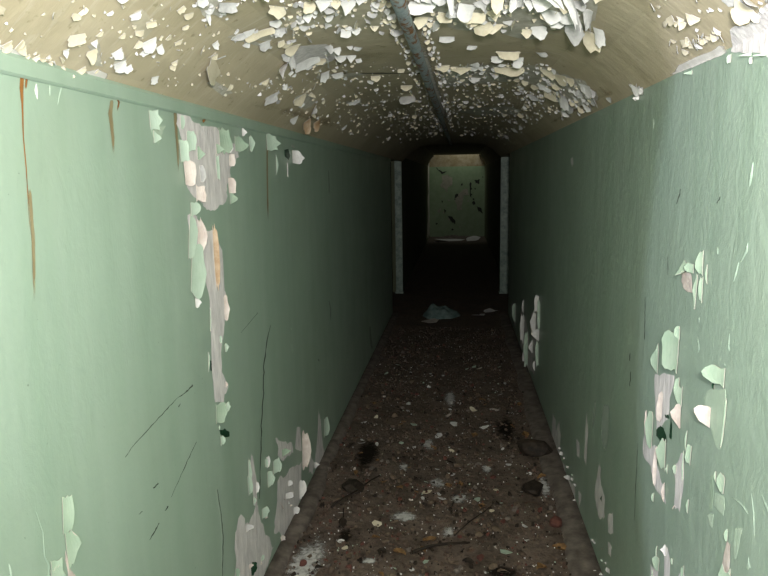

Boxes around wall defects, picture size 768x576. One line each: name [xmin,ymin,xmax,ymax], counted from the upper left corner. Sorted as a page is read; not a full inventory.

peeling [0,0,611,145]
flaking render [651,0,768,75]
corrosion [20,78,35,285]
corrosion [108,100,120,147]
peeling [266,133,304,177]
peeling [176,113,255,446]
peeling [675,250,708,309]
flaking render [511,295,540,374]
crack [126,385,193,456]
peeling [643,326,692,514]
peeling [694,364,727,450]
flaking render [235,411,330,576]